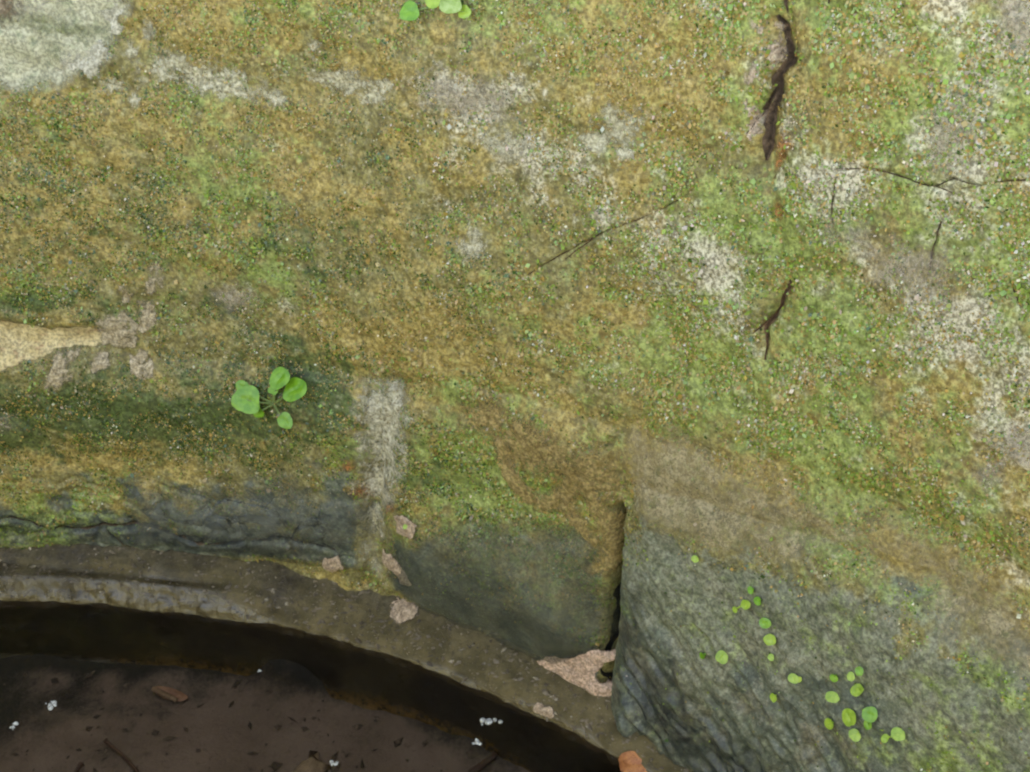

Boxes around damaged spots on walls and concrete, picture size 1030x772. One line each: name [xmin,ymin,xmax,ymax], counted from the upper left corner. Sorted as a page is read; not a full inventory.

crack [742,0,796,169]
crack [528,193,689,275]
crack [831,168,1030,228]
crack [926,221,942,283]
crack [753,280,792,360]